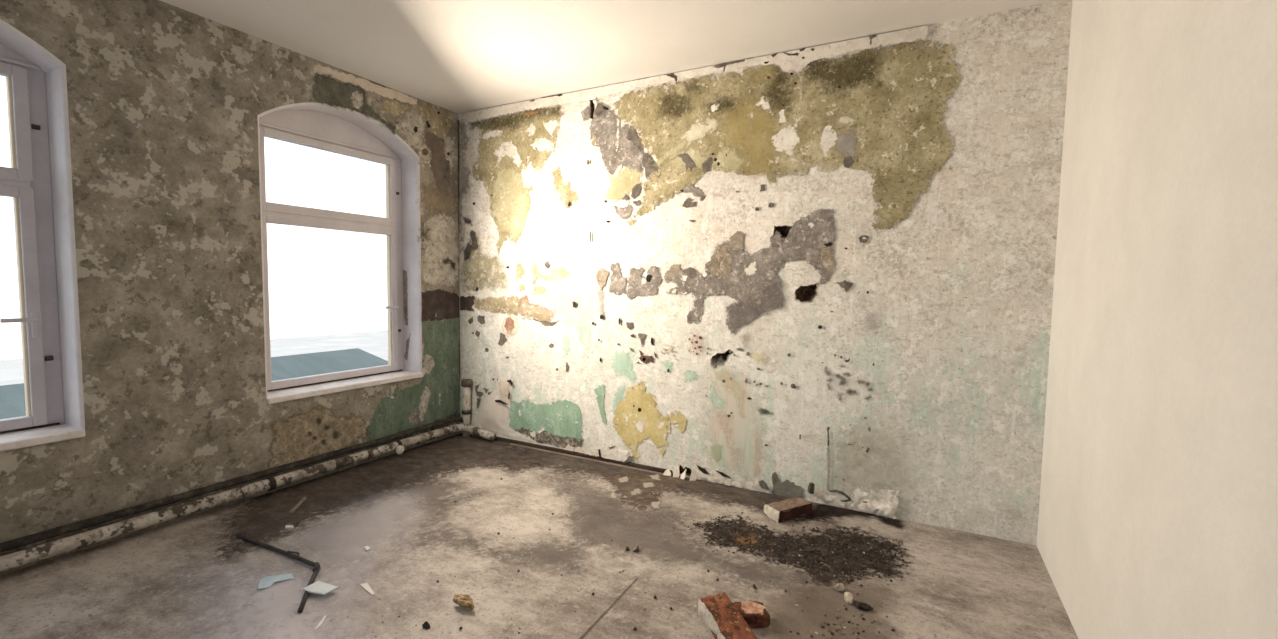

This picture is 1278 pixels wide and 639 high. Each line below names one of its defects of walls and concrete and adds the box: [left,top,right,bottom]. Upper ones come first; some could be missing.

peeling [268,25,962,519]